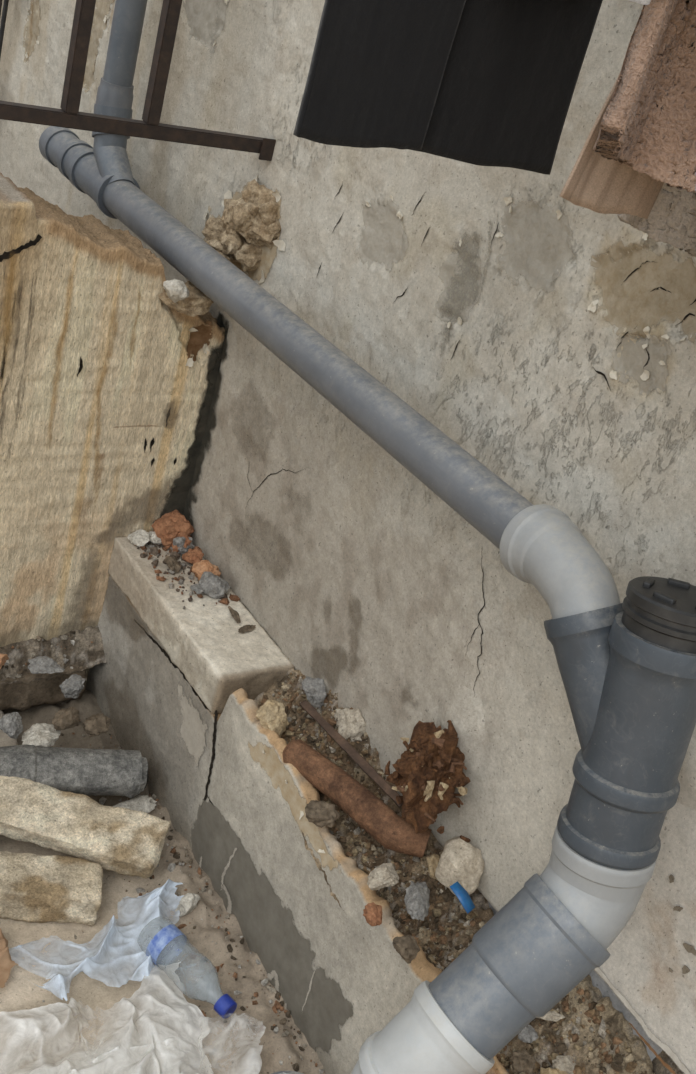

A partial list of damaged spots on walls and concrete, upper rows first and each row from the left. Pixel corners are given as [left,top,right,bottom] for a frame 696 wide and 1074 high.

crack [0,234,42,262]
spalling [158,279,214,367]
peeling [587,232,696,395]
leakage [102,312,229,541]
crack [466,558,485,693]
crack [134,619,218,804]
leakage [177,683,208,767]